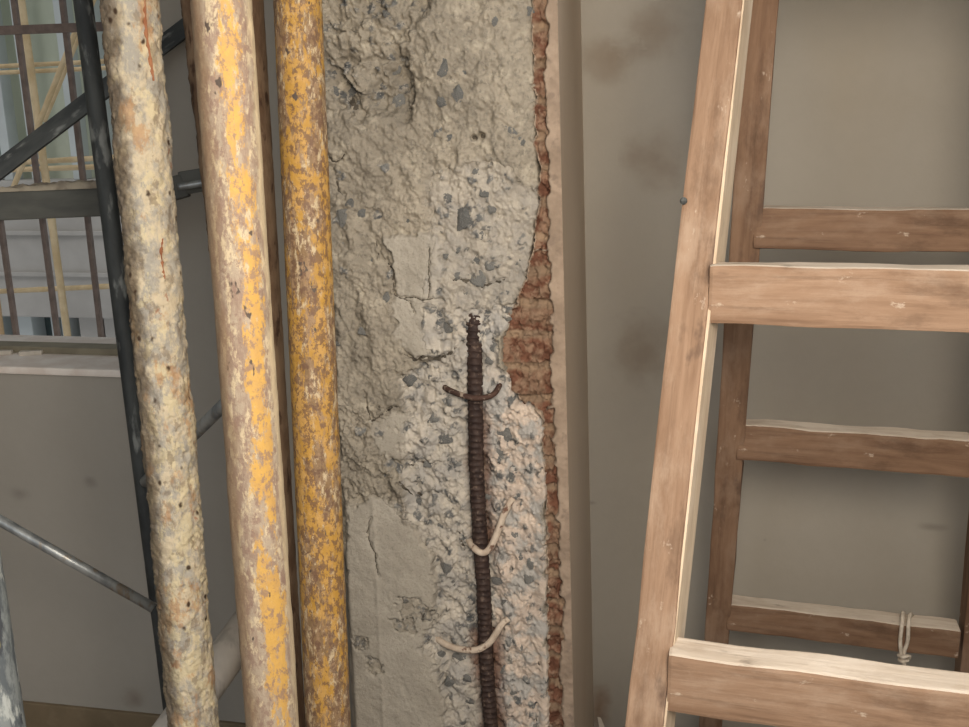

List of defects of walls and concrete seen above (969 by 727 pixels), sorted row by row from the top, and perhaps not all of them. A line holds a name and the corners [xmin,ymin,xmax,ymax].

crack [376,241,433,312]
crack [453,279,505,288]
spalling [322,0,565,727]